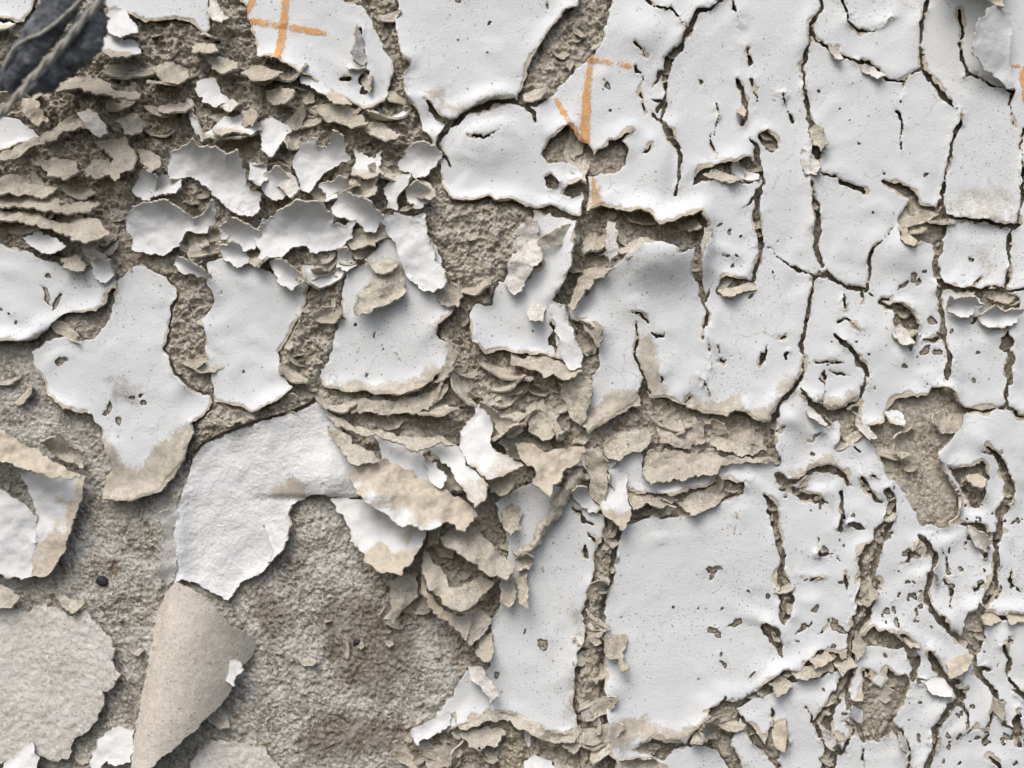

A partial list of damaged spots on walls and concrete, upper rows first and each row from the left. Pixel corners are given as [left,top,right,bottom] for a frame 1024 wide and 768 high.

crack [633,0,738,196]
peeling [800,124,830,176]
peeling [859,64,886,80]
flaking render [0,0,778,768]
crack [632,311,664,404]
crack [692,245,727,363]
crack [709,0,1024,768]
peeling [887,289,1024,386]
flaking render [806,383,1023,552]
crack [572,508,596,559]
peeling [933,562,963,589]
peeling [765,571,1024,765]